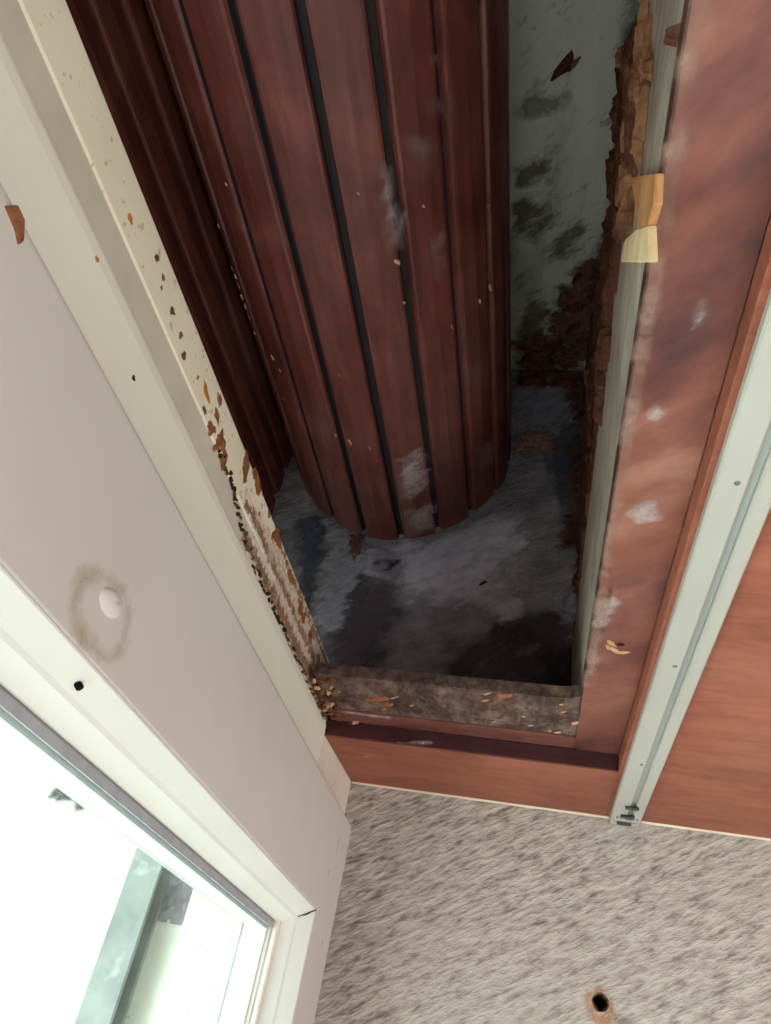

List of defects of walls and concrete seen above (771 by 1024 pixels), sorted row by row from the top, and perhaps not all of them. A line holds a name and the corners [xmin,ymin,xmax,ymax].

peeling [550,50,581,81]
peeling [601,44,631,255]
peeling [5,205,25,244]
water stain [513,160,555,238]
water stain [550,224,584,259]
peeling [241,490,336,721]
water stain [295,513,577,686]